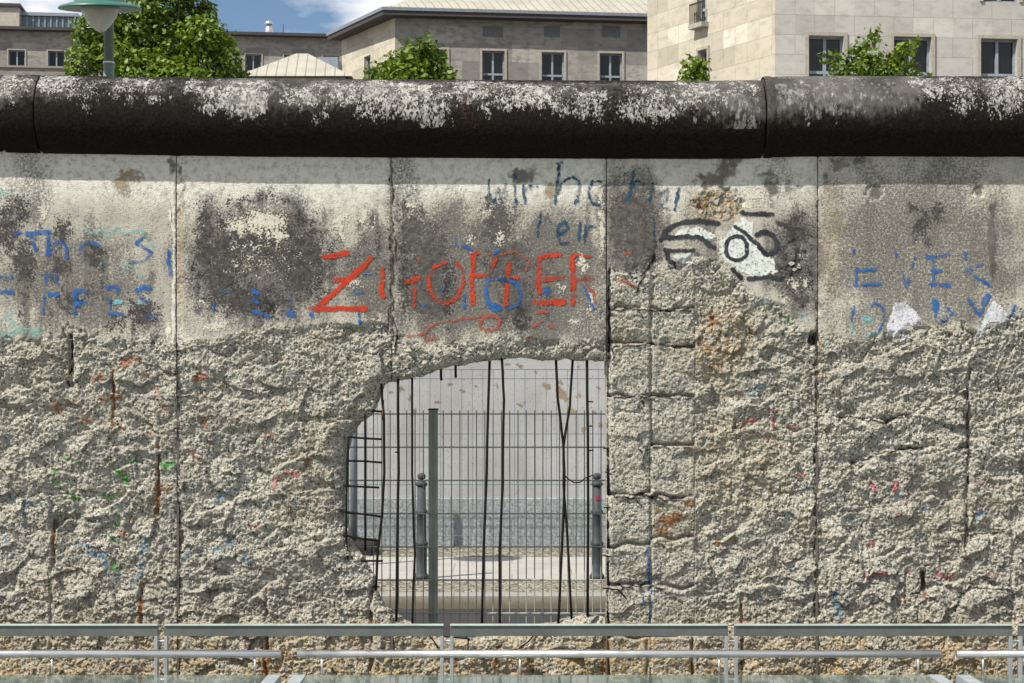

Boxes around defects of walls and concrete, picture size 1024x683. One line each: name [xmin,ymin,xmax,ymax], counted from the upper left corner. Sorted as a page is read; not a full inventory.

water stain [182,186,466,333]
rust [98,379,123,427]
spalling [0,174,1024,683]
rust [652,500,695,541]